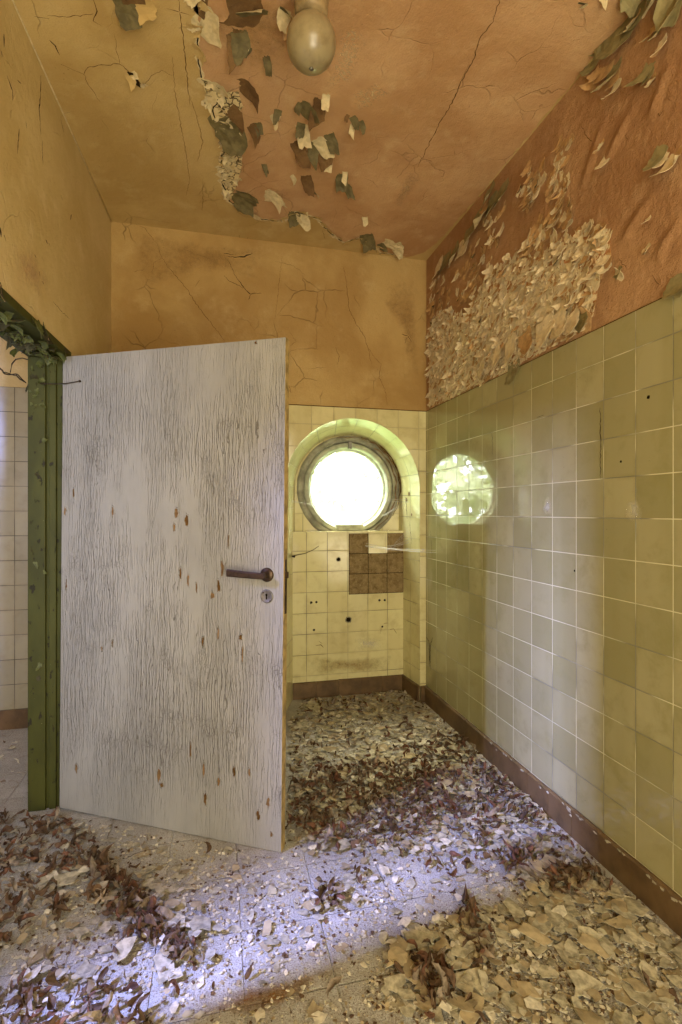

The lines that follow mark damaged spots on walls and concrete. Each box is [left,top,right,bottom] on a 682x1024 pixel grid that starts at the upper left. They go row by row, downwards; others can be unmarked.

crack [34,0,204,208]
peeling [182,0,682,408]
crack [418,0,500,166]
peeling [349,533,404,595]